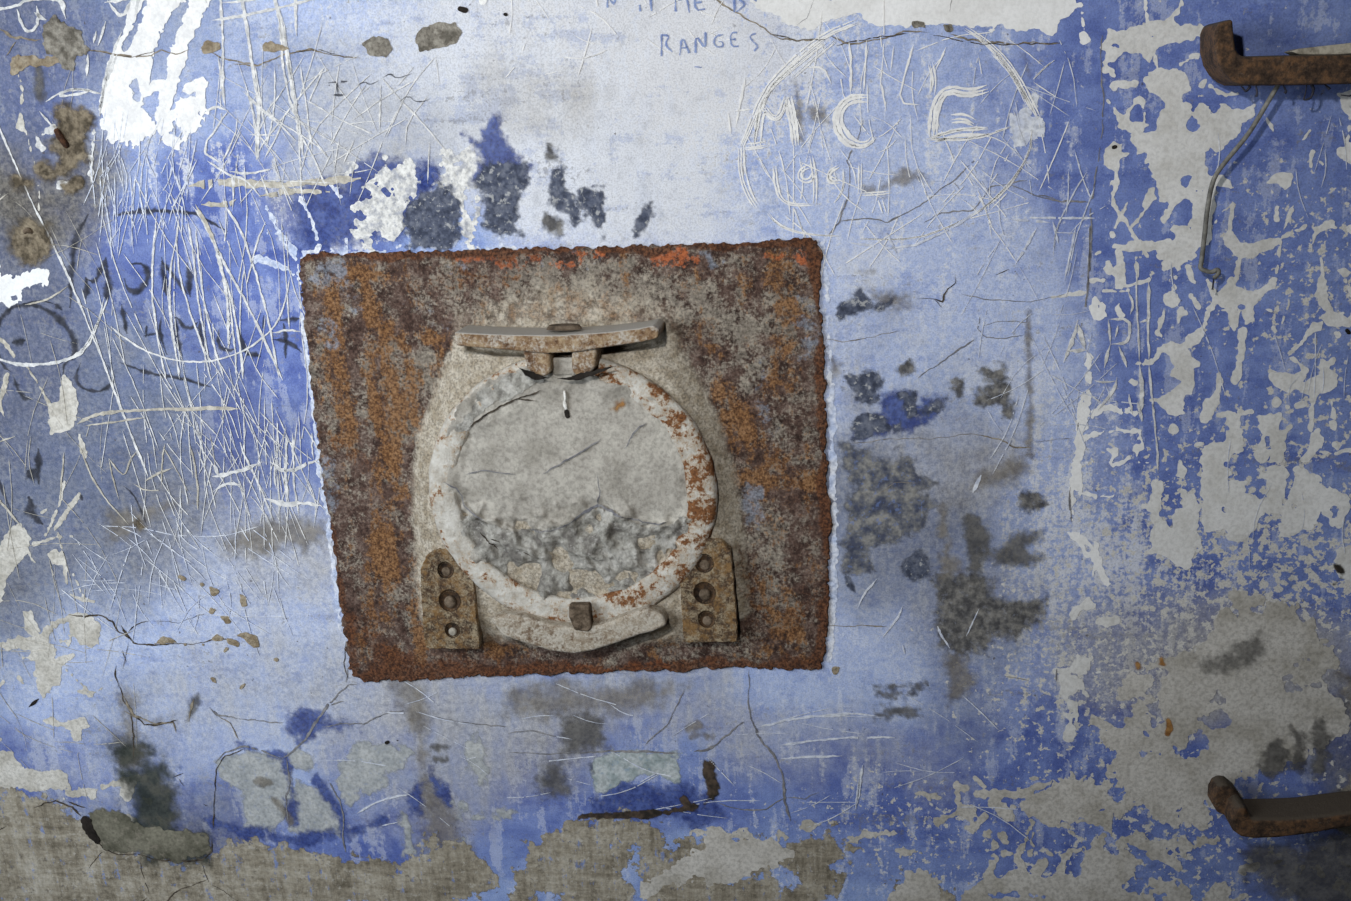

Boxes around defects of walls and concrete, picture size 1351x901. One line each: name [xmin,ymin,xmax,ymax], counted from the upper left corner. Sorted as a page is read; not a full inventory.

crack [717,0,1058,46]
spalling [0,14,96,308]
water stain [836,288,893,320]
crack [828,38,1104,378]
peeling [750,0,1351,586]
peeling [0,481,112,700]
water stain [834,364,1015,592]
water stain [901,514,1047,654]
crack [34,800,85,816]
water stain [113,696,179,831]
crack [68,614,401,901]
peeling [0,590,1351,901]